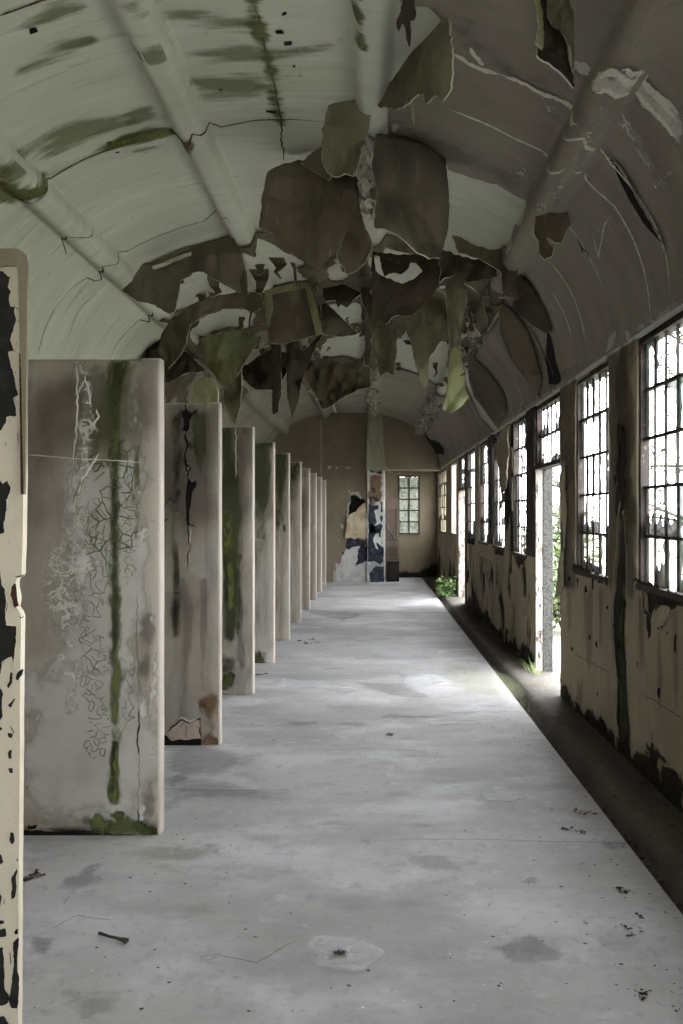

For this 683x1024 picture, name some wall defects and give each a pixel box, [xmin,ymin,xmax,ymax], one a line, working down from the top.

leakage [0,152,47,204]
leakage [41,108,181,156]
crack [0,5,324,255]
peeling [122,0,524,478]
crack [449,48,679,309]
peeling [0,270,19,432]
peeling [0,571,23,773]
leakage [24,361,158,822]
crack [78,439,140,821]
crack [182,404,198,568]
leakage [222,428,242,641]
peeling [0,920,19,1024]